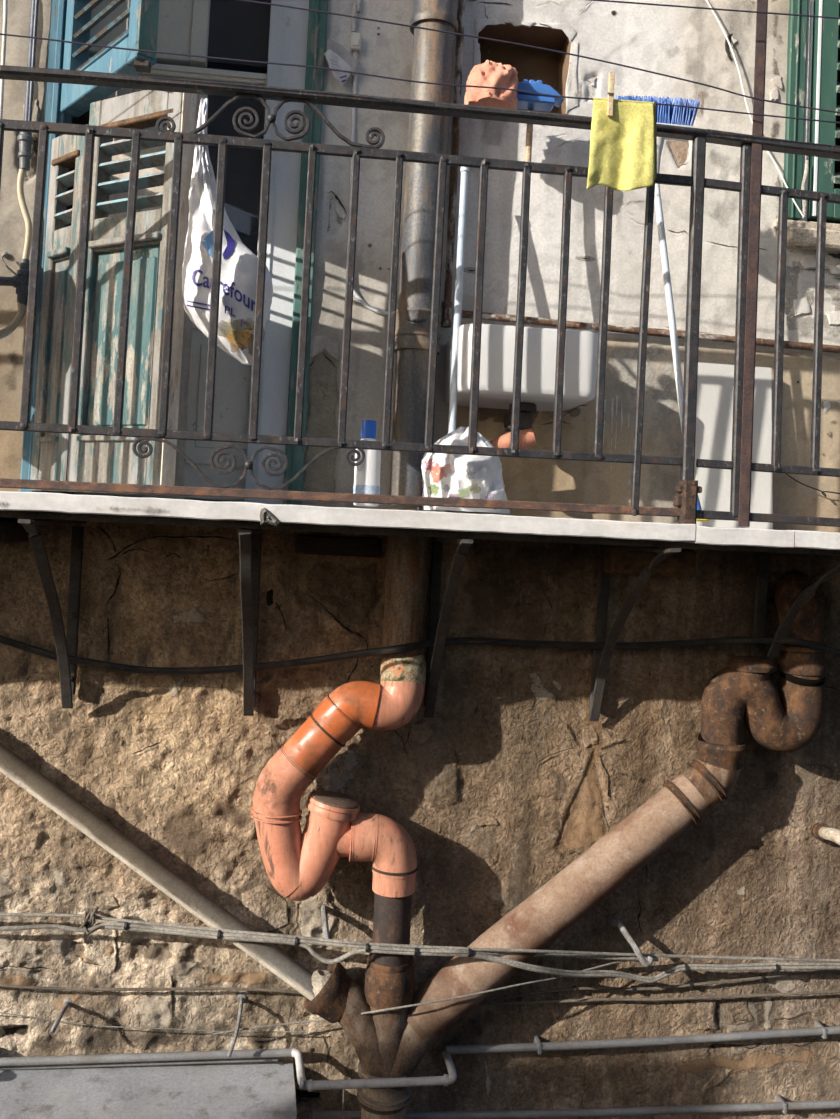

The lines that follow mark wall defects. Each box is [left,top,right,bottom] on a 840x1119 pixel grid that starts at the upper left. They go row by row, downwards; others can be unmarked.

peeling [785,251,840,336]
crack [94,526,240,662]
crack [0,965,53,973]
crack [111,921,119,972]
crack [167,975,175,1021]